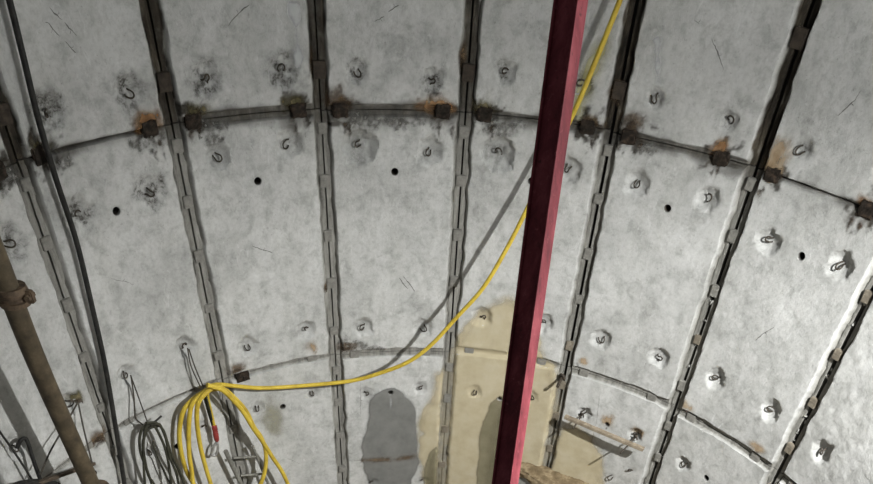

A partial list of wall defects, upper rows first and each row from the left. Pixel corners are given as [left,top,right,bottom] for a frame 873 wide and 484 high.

corrosion [765,141,786,173]
leakage [362,300,515,484]
leakage [522,339,603,484]